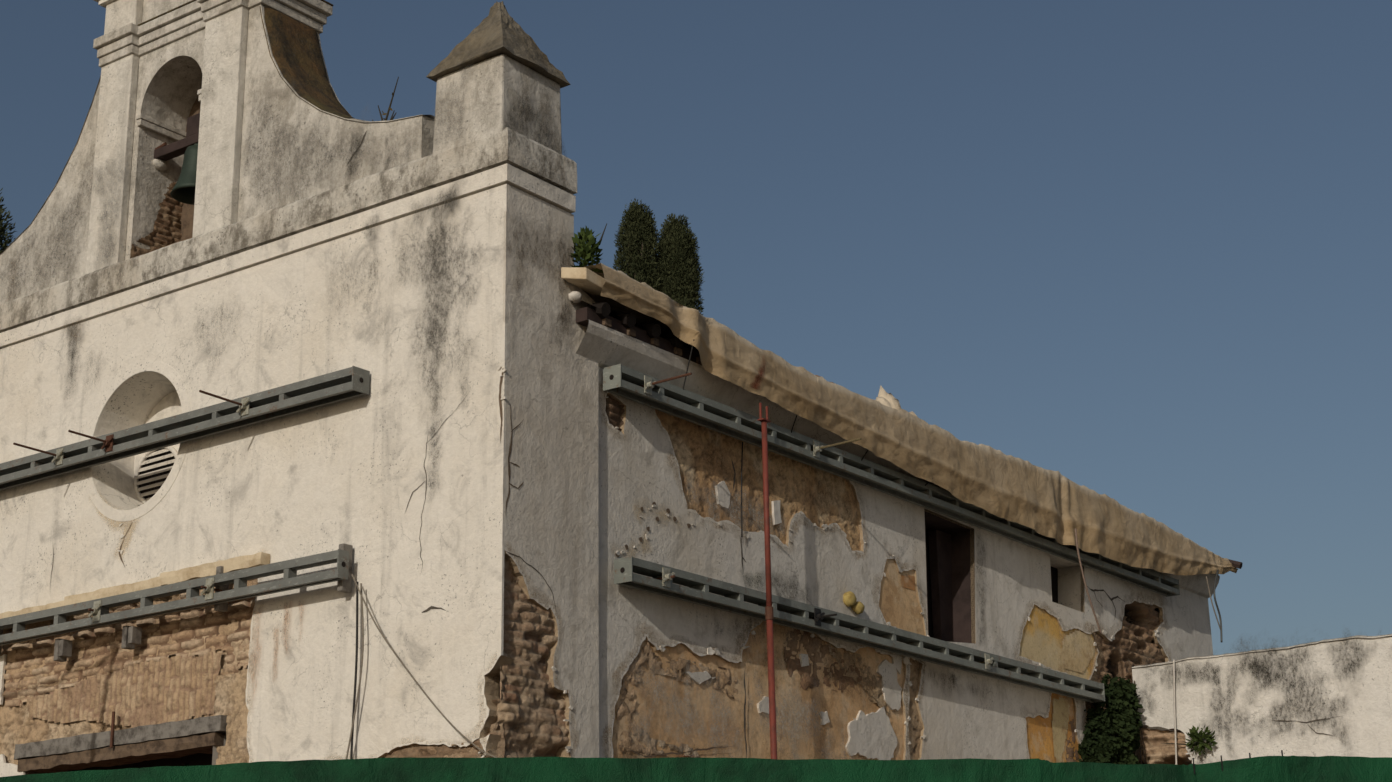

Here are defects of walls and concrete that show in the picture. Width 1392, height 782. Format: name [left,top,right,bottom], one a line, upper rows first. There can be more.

water stain [403,191,476,390]
crack [405,365,524,571]
flaking render [615,409,868,557]
flaking render [0,578,258,777]
flaking render [382,547,576,758]
flaking render [604,612,926,760]
flaking render [879,554,930,637]
flaking render [1026,693,1123,763]
flaking render [1019,595,1170,684]
flaking render [1133,725,1196,765]
water stain [1161,639,1345,749]